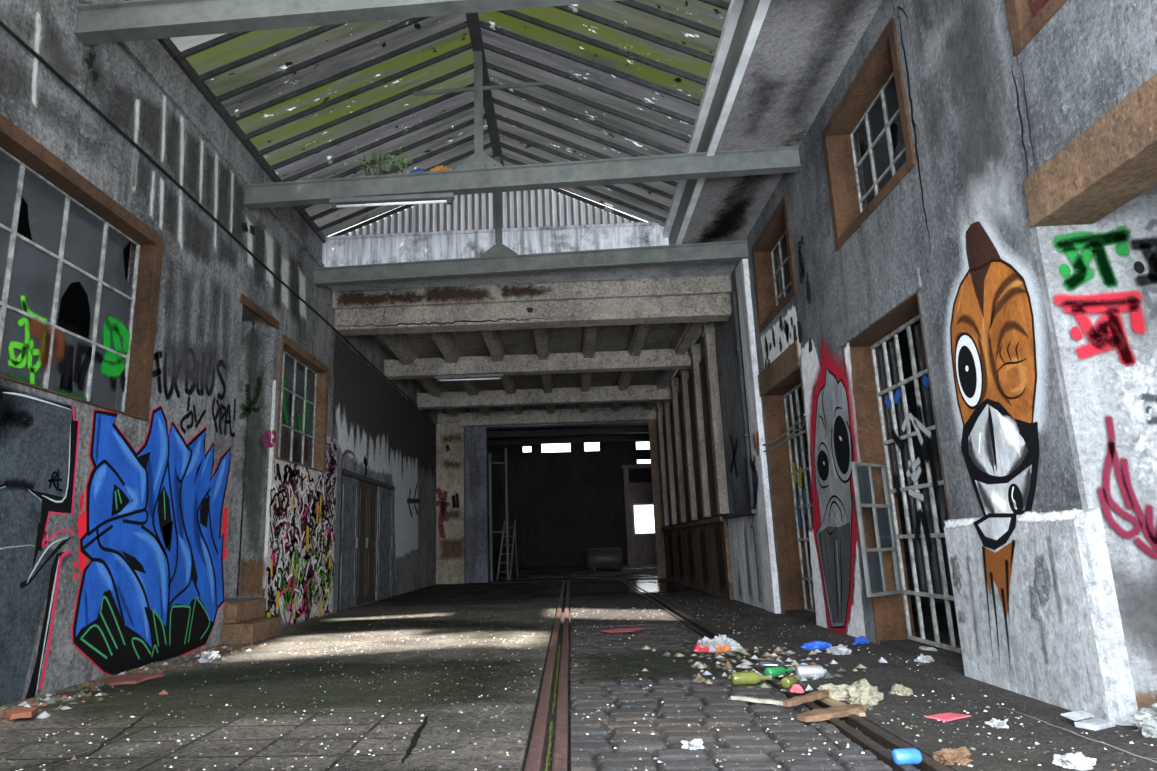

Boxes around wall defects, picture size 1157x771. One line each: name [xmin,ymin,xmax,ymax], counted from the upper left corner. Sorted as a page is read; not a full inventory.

water stain [0,13,74,121]
water stain [792,0,859,114]
crack [1011,64,1036,177]
water stain [85,49,307,321]
water stain [702,174,765,243]
crack [10,707,157,771]